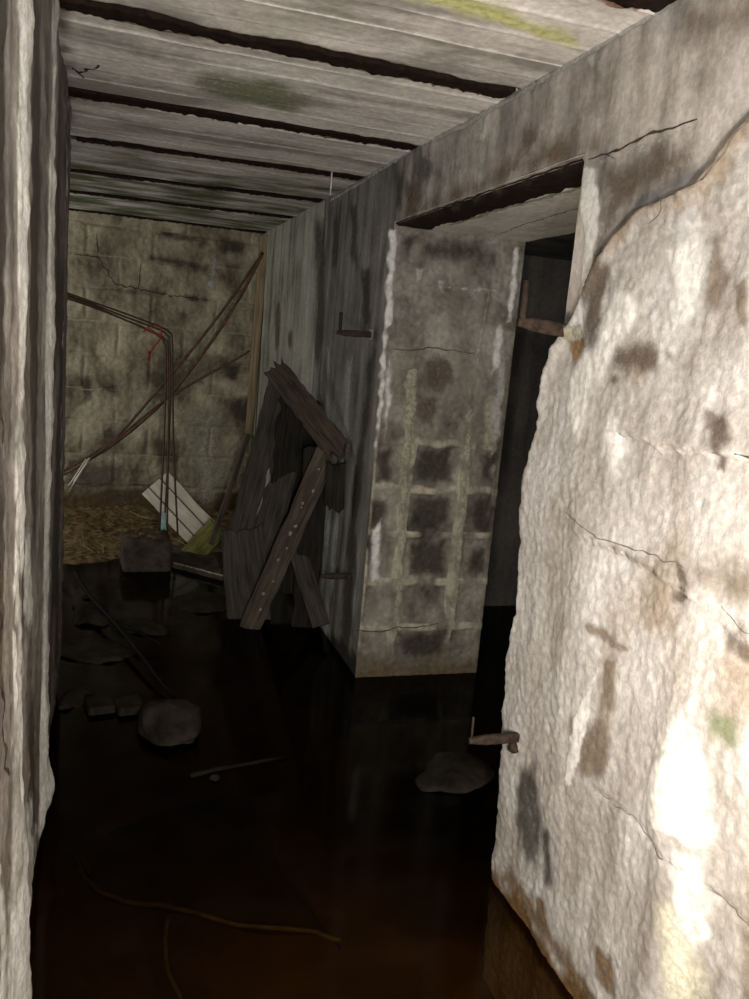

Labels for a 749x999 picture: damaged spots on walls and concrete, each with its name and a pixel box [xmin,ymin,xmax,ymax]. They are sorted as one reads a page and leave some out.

crack [588,119,697,163]
crack [646,119,749,224]
crack [74,236,207,300]
leakage [567,146,687,443]
leakage [665,231,746,324]
leakage [320,230,412,649]
leakage [398,360,452,573]
leakage [438,247,519,598]
leakage [603,408,629,478]
leakage [707,412,730,471]
crack [565,512,683,568]
leakage [564,661,613,787]